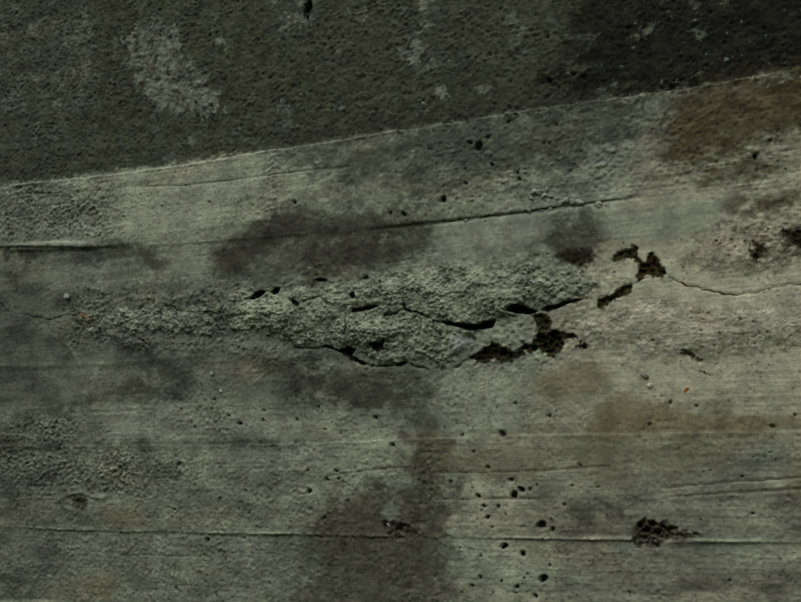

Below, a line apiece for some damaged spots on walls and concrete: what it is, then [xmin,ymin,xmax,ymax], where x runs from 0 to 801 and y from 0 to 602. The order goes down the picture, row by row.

damp [695,158,779,192]
damp [215,197,729,283]
spalling [780,230,801,248]
spalling [597,245,666,309]
crack [667,275,801,296]
crack [23,304,217,345]
crack [382,286,442,338]
spalling [442,320,496,331]
spalling [469,299,587,364]